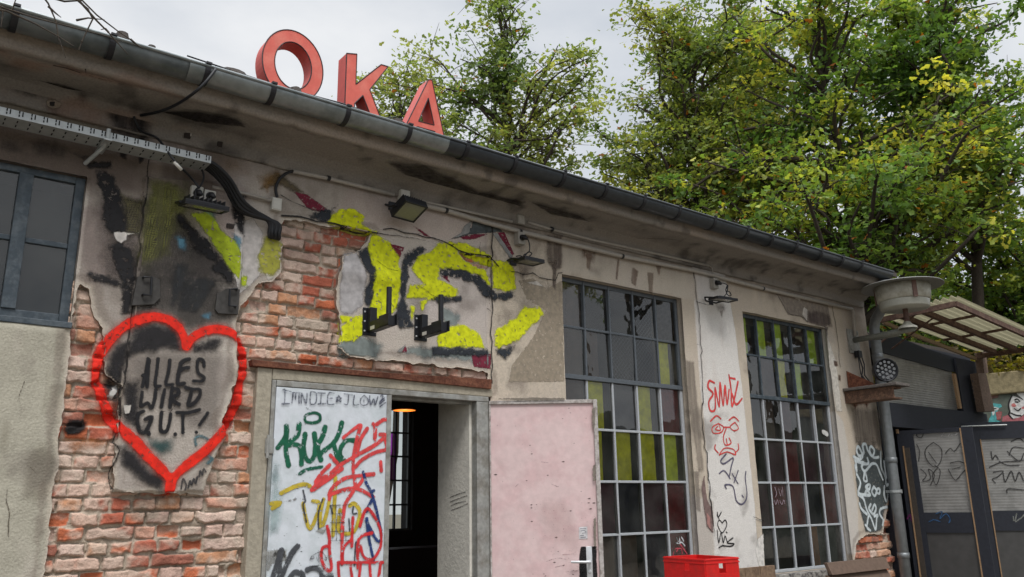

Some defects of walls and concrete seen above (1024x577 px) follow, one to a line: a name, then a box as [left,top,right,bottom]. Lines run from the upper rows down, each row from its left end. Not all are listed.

damp [391,164,522,206]
damp [535,204,587,221]
flaking render [459,253,491,269]
flaking render [43,219,486,577]
flaking render [855,500,895,577]